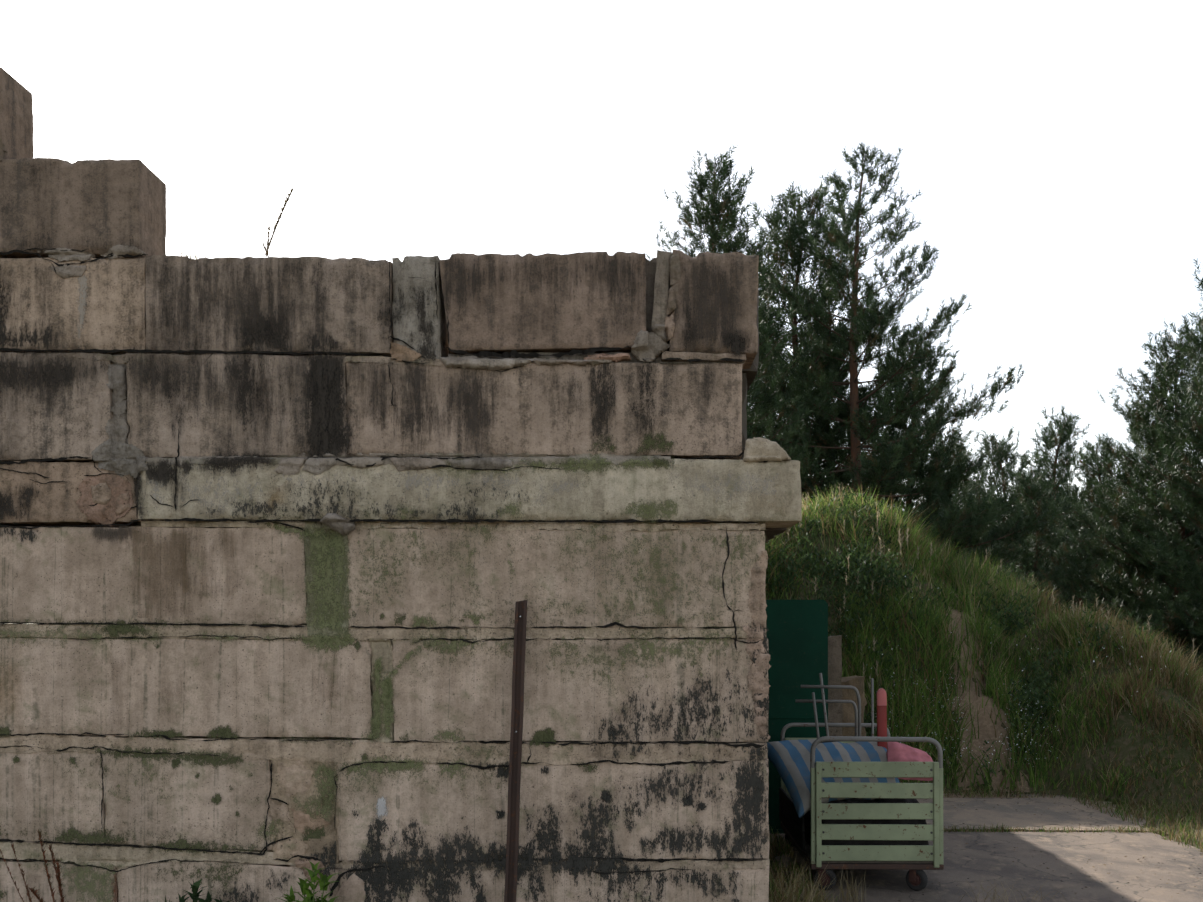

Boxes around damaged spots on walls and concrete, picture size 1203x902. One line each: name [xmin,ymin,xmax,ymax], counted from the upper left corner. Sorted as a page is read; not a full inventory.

damp [0,265,107,398]
damp [224,297,292,430]
damp [282,267,352,458]
damp [378,283,449,433]
damp [450,372,487,452]
damp [590,361,662,440]
damp [675,254,749,357]
damp [94,452,573,594]
crack [0,429,768,651]
damp [216,623,769,902]